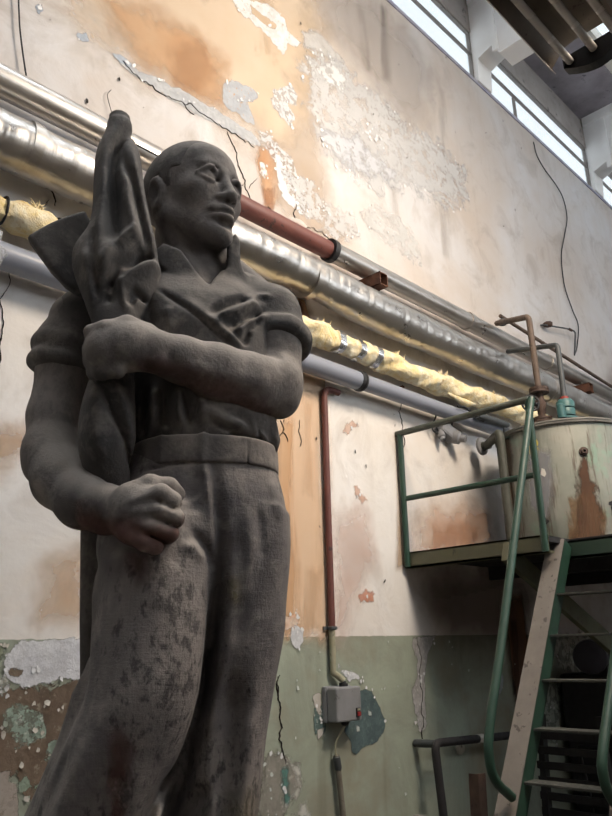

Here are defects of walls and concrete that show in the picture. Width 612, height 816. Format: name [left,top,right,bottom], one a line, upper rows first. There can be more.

leakage [76,0,337,233]
peeling [113,53,360,243]
peeling [233,0,469,212]
crack [0,276,11,363]
peeling [285,609,304,651]
flaking render [358,589,374,603]
peeling [0,636,80,816]
crack [276,675,286,764]
peeling [313,693,326,739]
peeling [338,664,387,754]
peeling [411,633,438,732]
peeling [258,751,311,816]